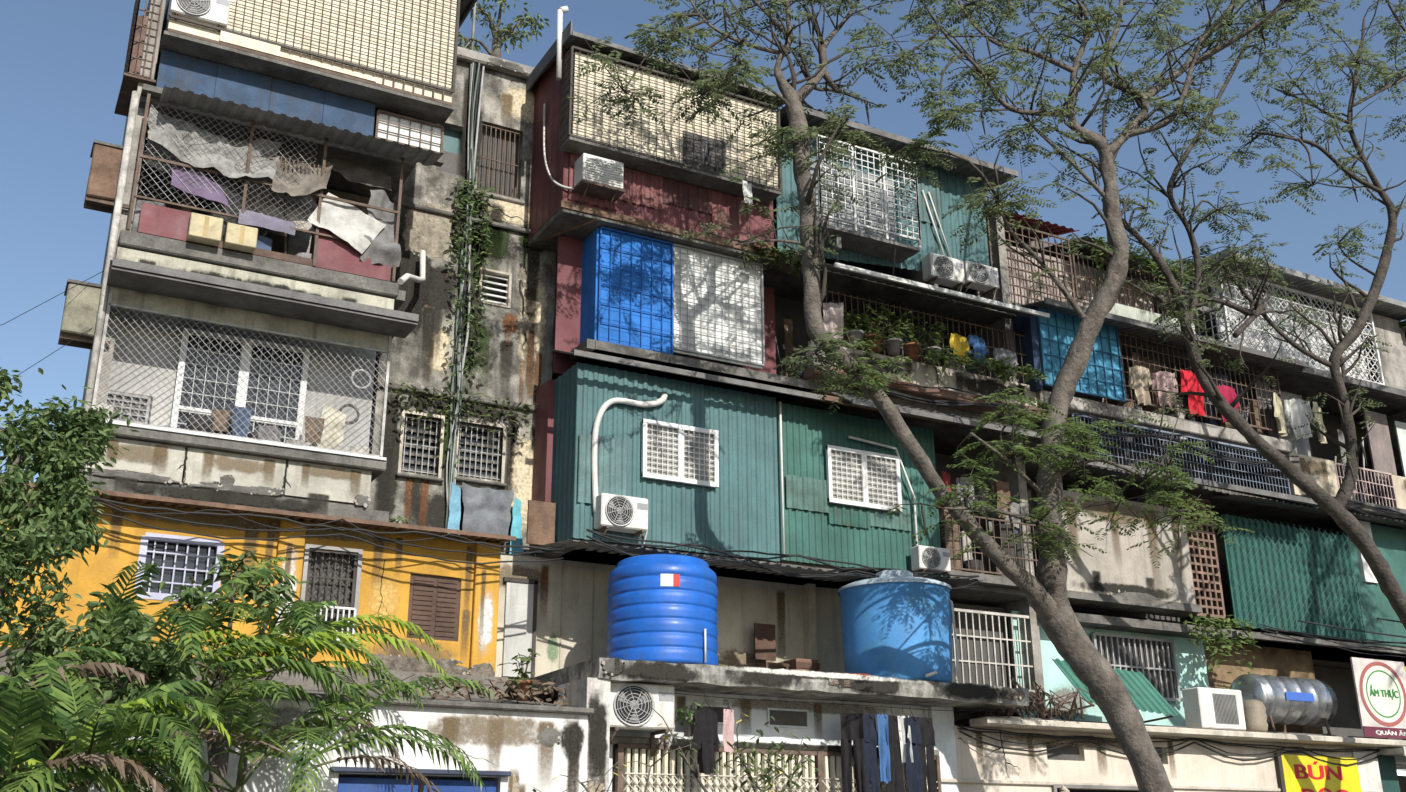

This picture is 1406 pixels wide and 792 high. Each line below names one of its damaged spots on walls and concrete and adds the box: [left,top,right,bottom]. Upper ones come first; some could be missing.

leakage [394,79,539,383]
leakage [430,698,607,792]